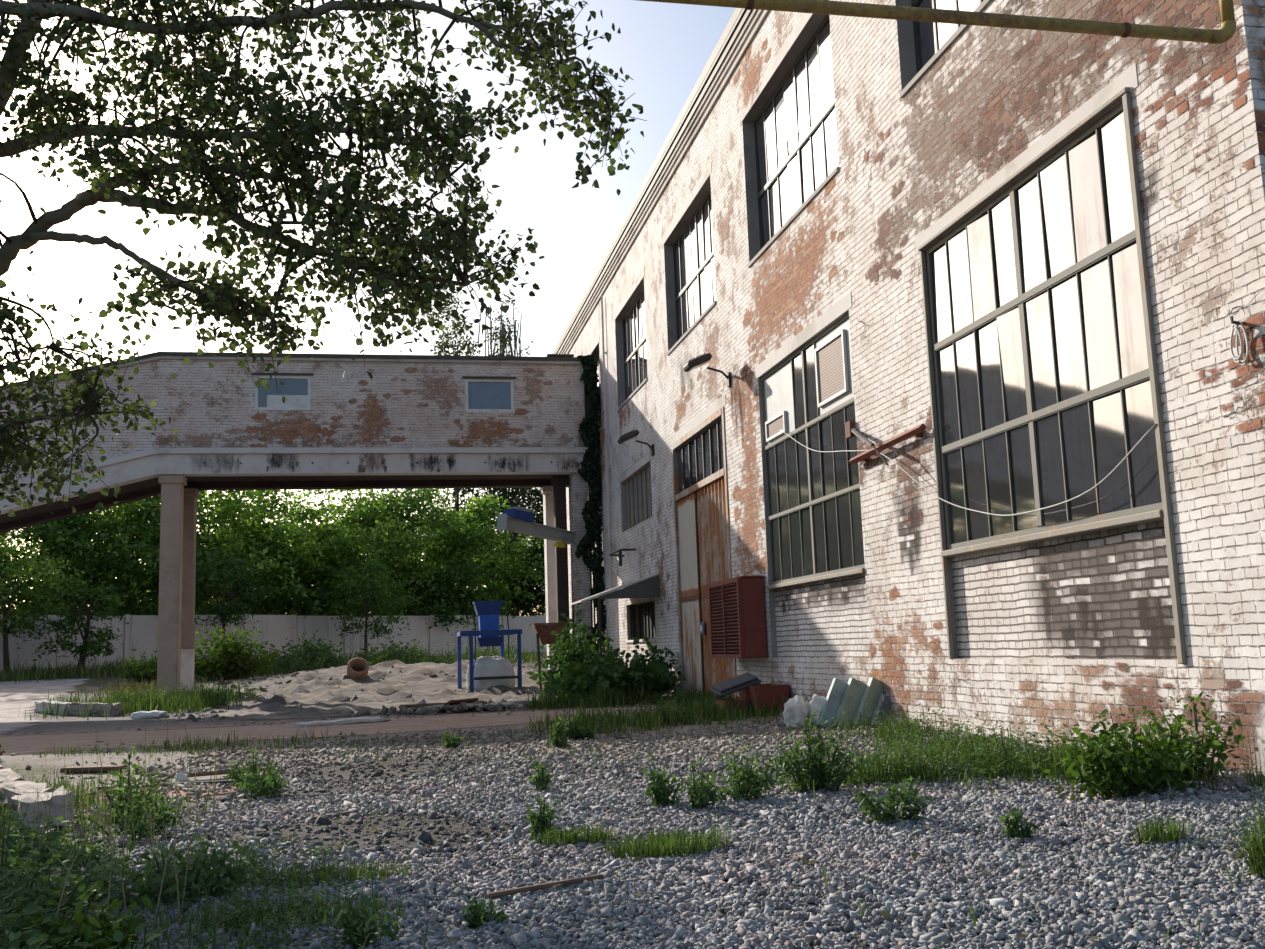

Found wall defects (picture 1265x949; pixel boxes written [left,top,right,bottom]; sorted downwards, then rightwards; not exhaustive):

peeling [864,0,1265,286]
leakage [267,454,298,472]
peeling [155,368,552,448]
leakage [411,454,455,472]
peeling [674,179,844,576]
leakage [895,490,919,574]
leakage [1030,521,1177,659]
peeling [866,586,942,719]
peeling [1019,662,1264,774]